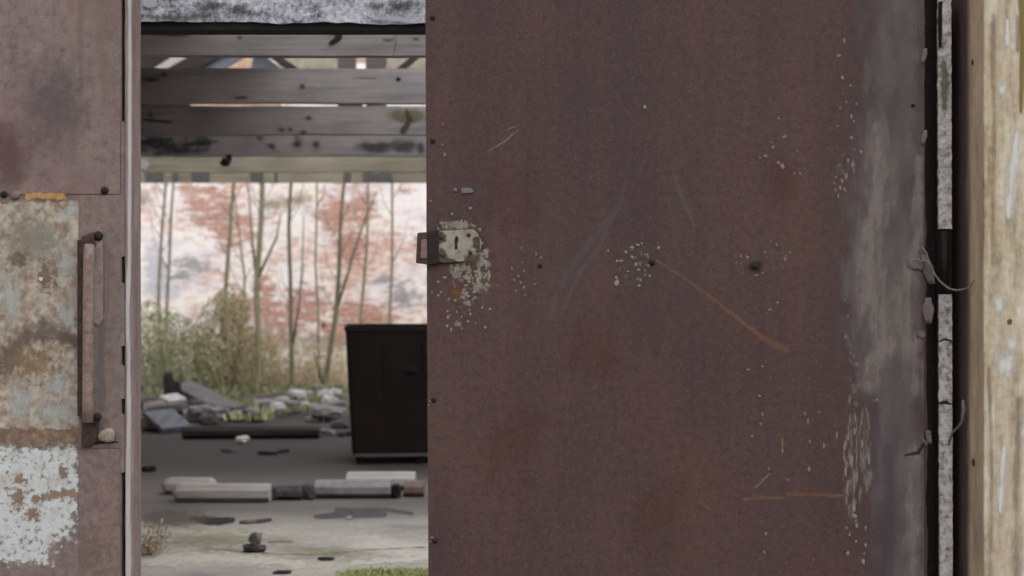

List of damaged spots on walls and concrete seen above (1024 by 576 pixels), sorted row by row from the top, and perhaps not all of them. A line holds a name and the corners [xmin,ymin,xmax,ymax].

corrosion [25,191,67,200]
corrosion [38,259,57,288]
peeling [431,207,498,331]
corrosion [0,321,77,378]
corrosion [0,427,79,449]
peeling [836,331,881,564]
peeling [0,444,78,568]